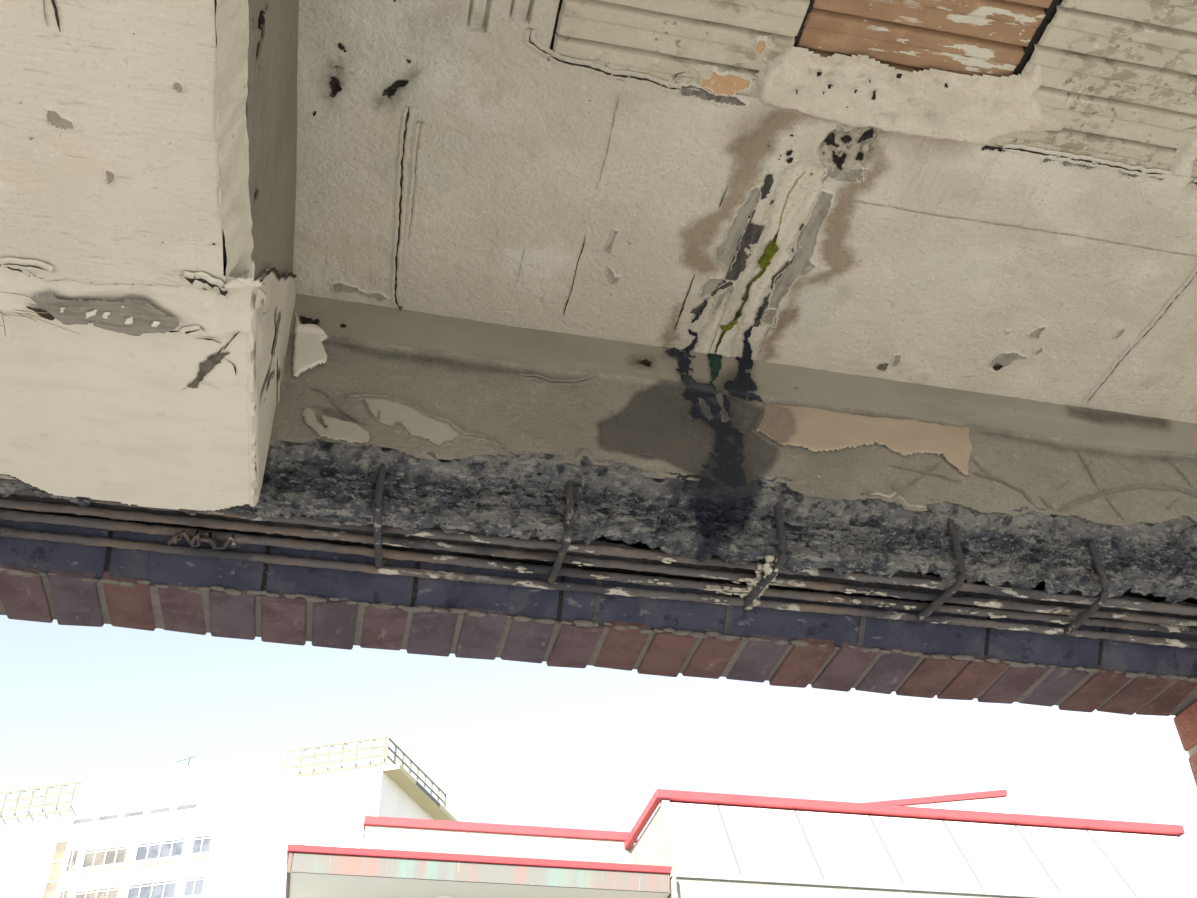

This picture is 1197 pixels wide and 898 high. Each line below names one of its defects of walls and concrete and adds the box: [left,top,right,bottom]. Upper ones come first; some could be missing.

peeling [0,258,53,277]
spalling [14,292,239,390]
peeling [180,271,264,299]
crack [260,267,297,282]
crack [390,106,425,311]
damp [598,163,825,490]
damp [683,113,798,273]
damp [793,131,886,289]
crack [857,202,1197,403]
spalling [0,403,1197,627]